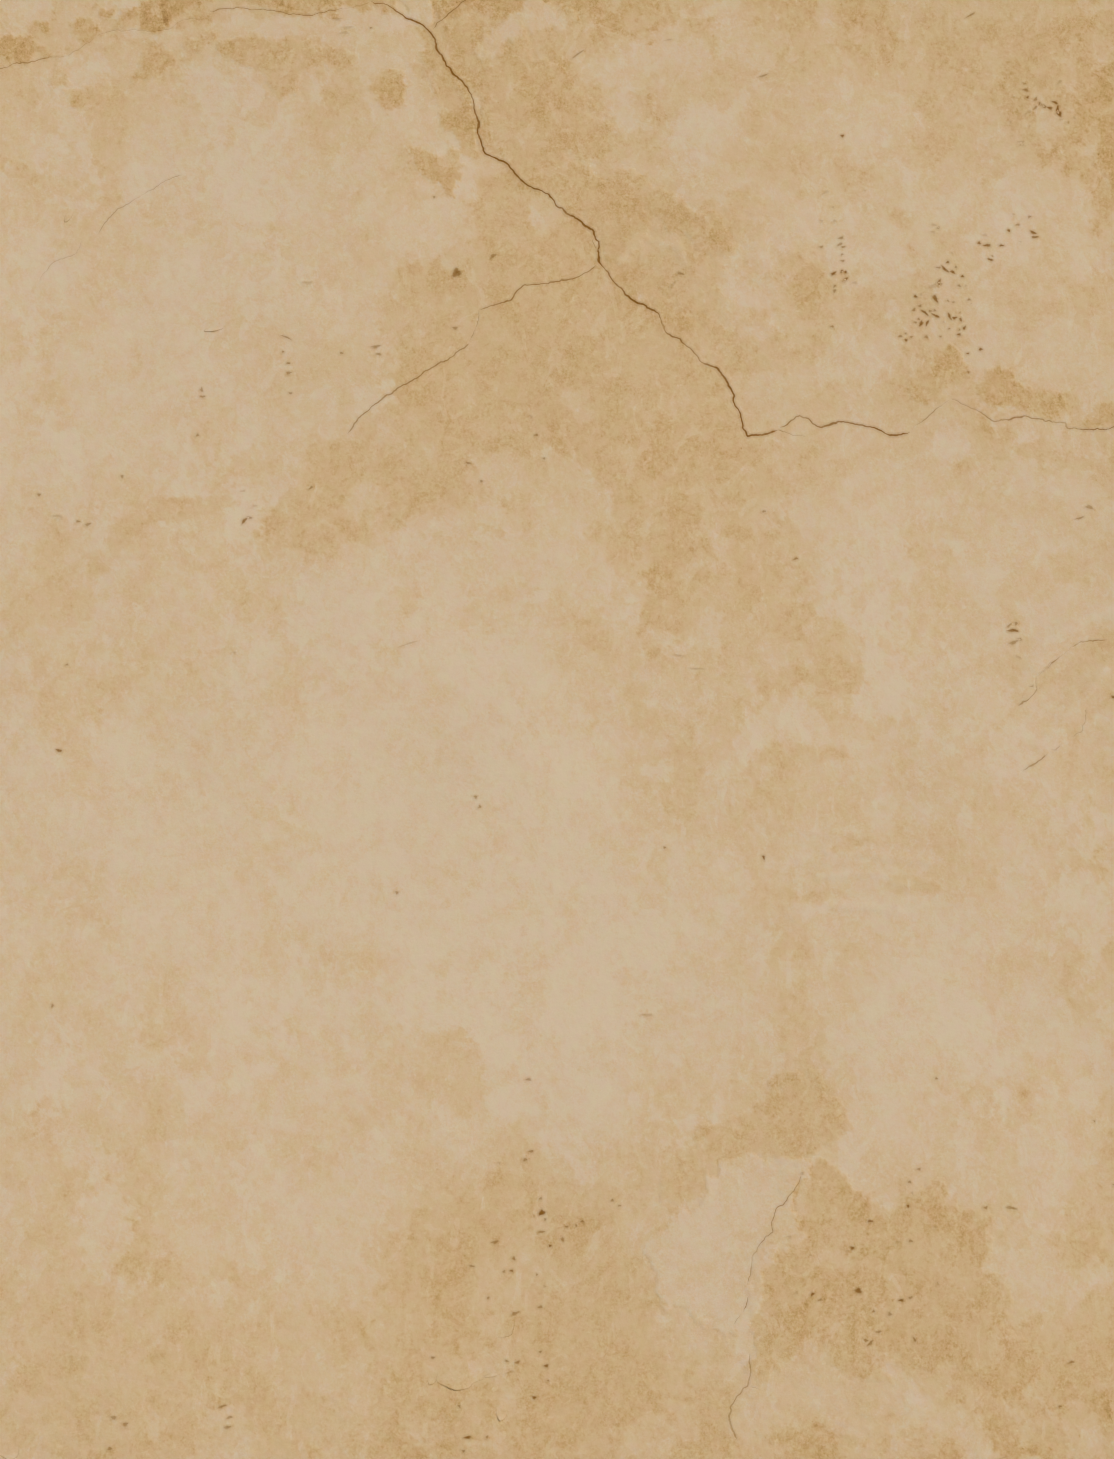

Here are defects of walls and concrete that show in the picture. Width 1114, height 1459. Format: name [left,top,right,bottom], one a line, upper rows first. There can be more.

crack [0,0,1114,439]